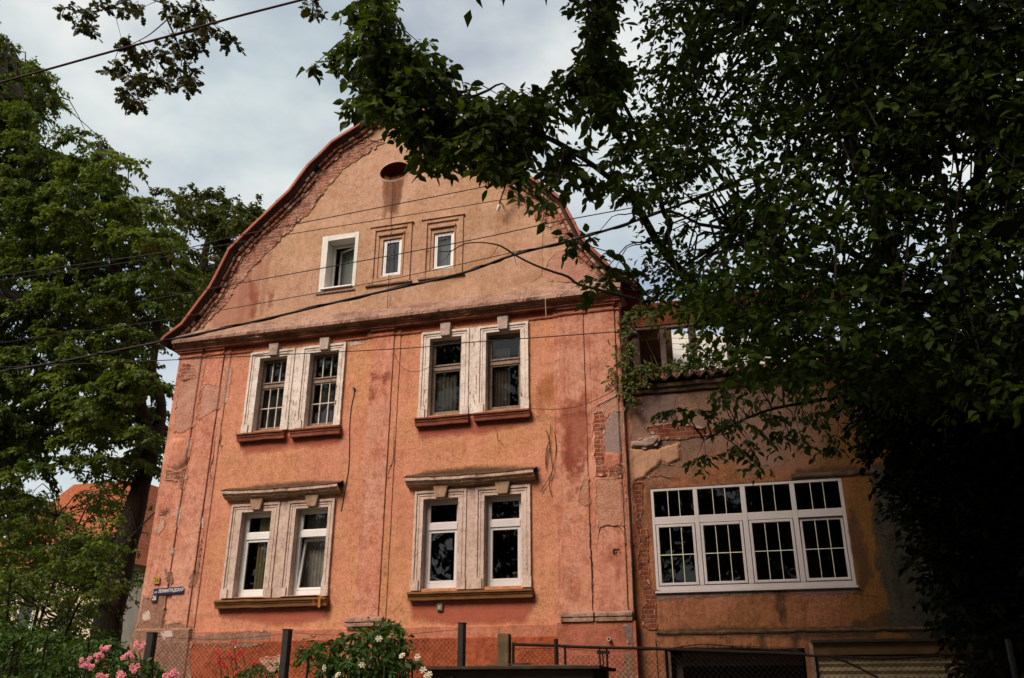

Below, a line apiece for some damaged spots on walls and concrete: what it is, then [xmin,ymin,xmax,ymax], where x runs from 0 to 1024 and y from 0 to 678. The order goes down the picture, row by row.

spalling [196,128,395,331]
leakage [385,179,401,212]
peeling [164,354,233,490]
flaking render [577,393,735,639]